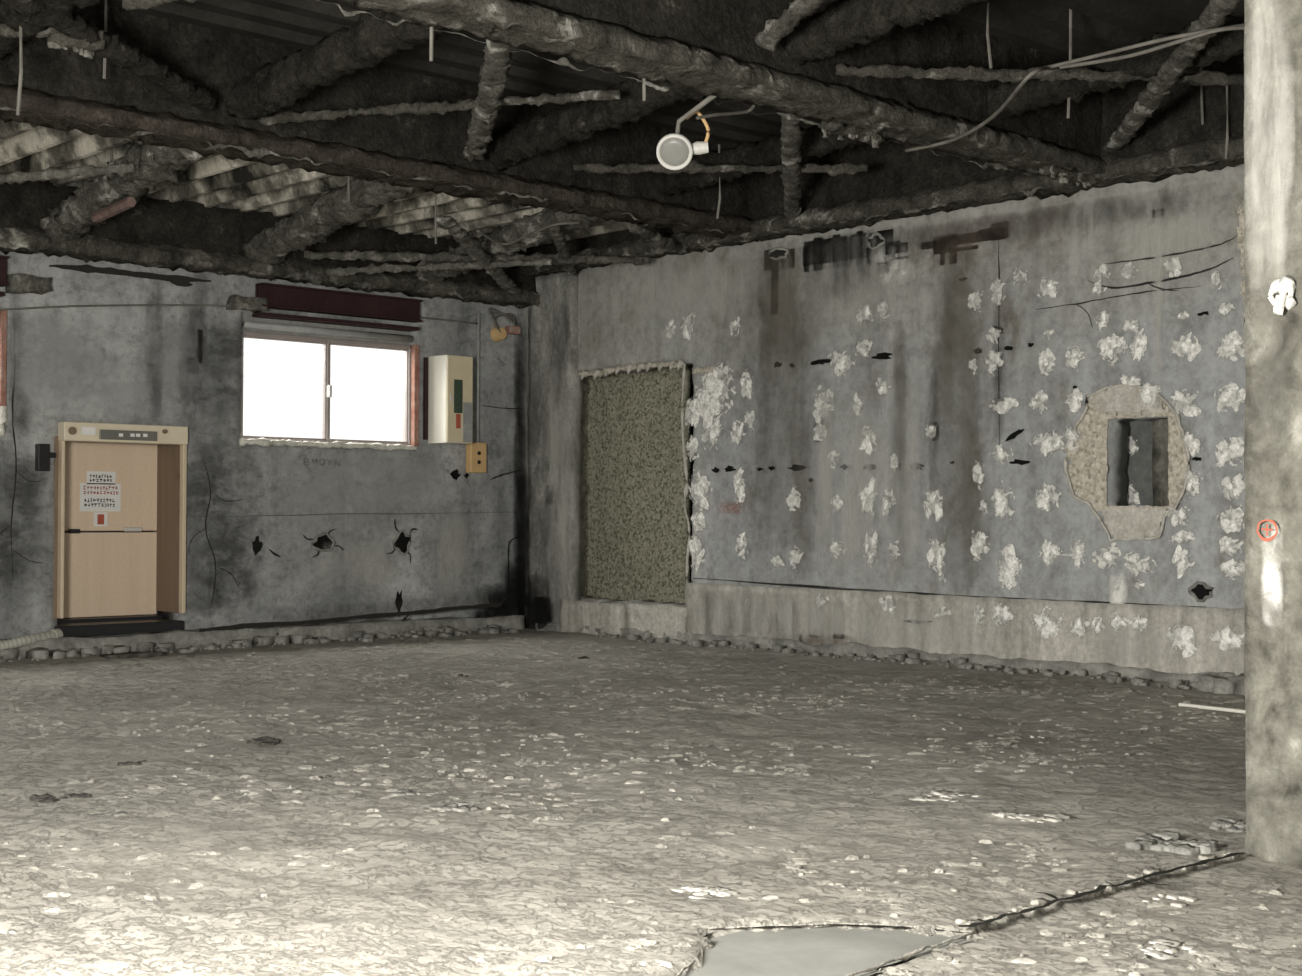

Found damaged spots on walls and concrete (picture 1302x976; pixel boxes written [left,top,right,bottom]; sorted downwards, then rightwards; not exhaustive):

peeling [1039,165,1098,189]
spalling [91,197,137,223]
spalling [1221,201,1245,352]
peeling [1038,329,1081,366]
peeling [1097,311,1147,362]
peeling [1178,311,1196,362]
peeling [1220,382,1246,403]
peeling [1215,440,1241,465]
peeling [1036,486,1050,512]
spalling [1041,375,1214,602]
peeling [1219,475,1245,574]
crack [704,852,1247,937]